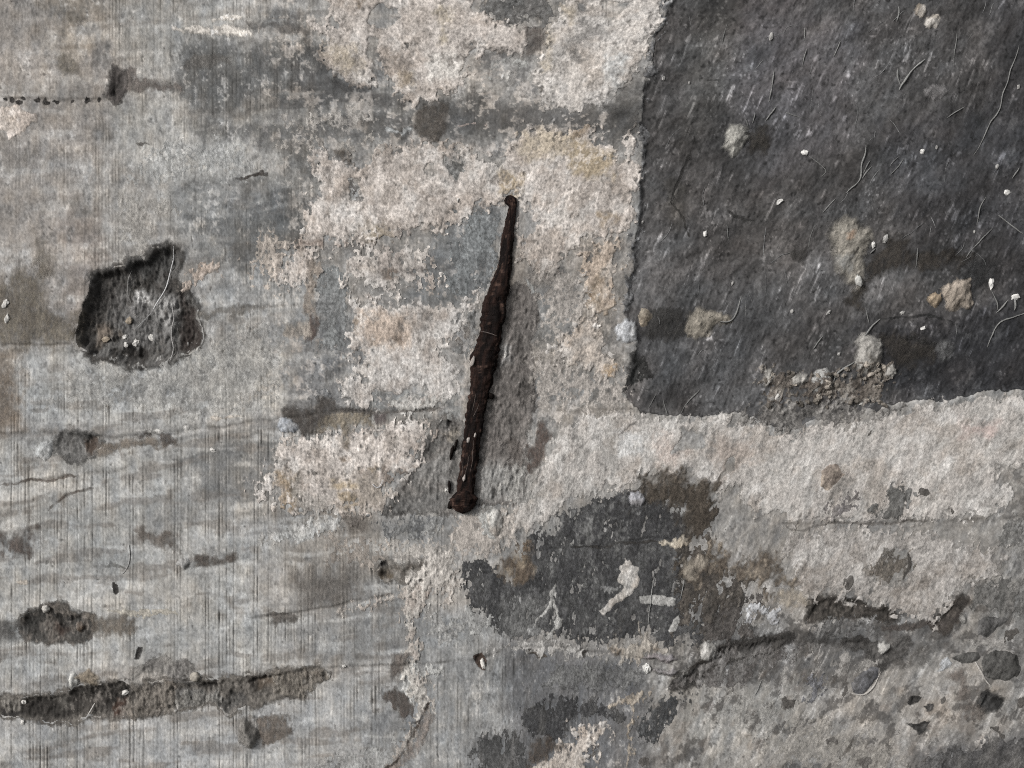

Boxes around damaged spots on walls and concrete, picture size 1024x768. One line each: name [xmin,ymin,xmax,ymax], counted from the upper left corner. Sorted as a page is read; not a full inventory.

hole [73,240,206,372]
hole [624,352,653,392]
spalling [726,355,907,437]
spalling [52,429,105,465]
hole [17,600,94,646]
peeling [458,478,930,768]
spalling [122,656,198,695]